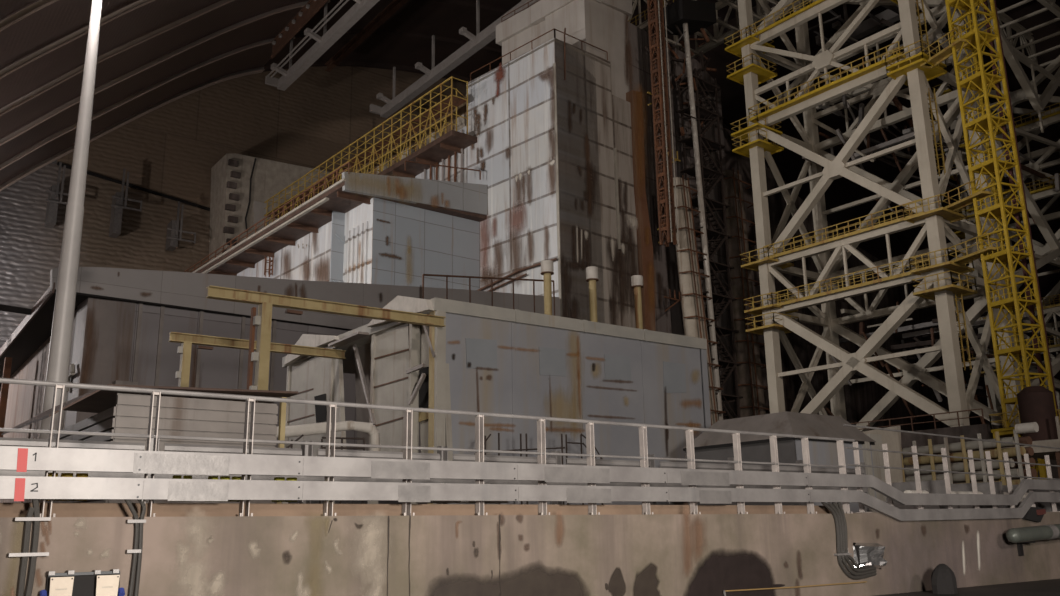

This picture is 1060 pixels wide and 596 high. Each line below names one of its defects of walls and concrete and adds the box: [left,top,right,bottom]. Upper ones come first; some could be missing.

rust [540,69,555,192]
rust [284,233,328,298]
rust [481,169,548,287]